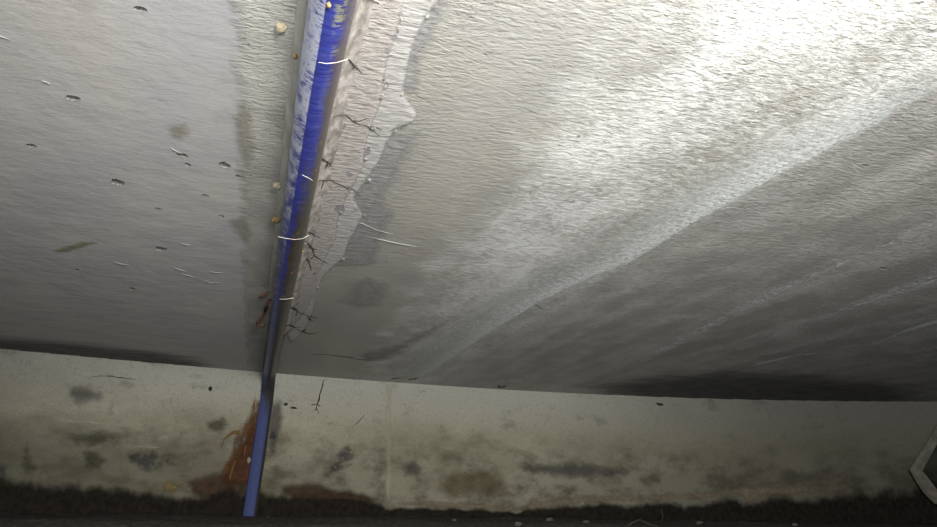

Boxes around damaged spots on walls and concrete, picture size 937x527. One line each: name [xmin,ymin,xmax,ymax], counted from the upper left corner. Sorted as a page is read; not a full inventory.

peeling [284,0,437,341]
corrosion [221,400,260,483]
damp [535,466,613,475]